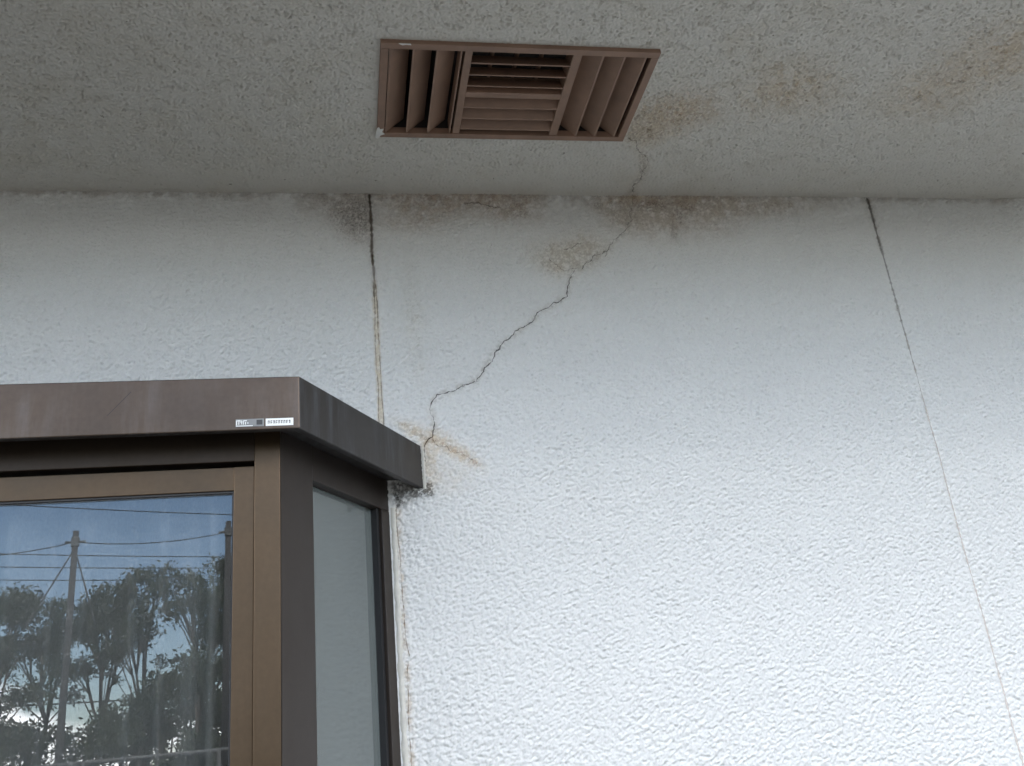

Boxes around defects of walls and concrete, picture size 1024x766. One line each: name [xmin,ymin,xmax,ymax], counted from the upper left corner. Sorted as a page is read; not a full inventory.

crack [424,250,608,457]
water stain [394,483,433,507]